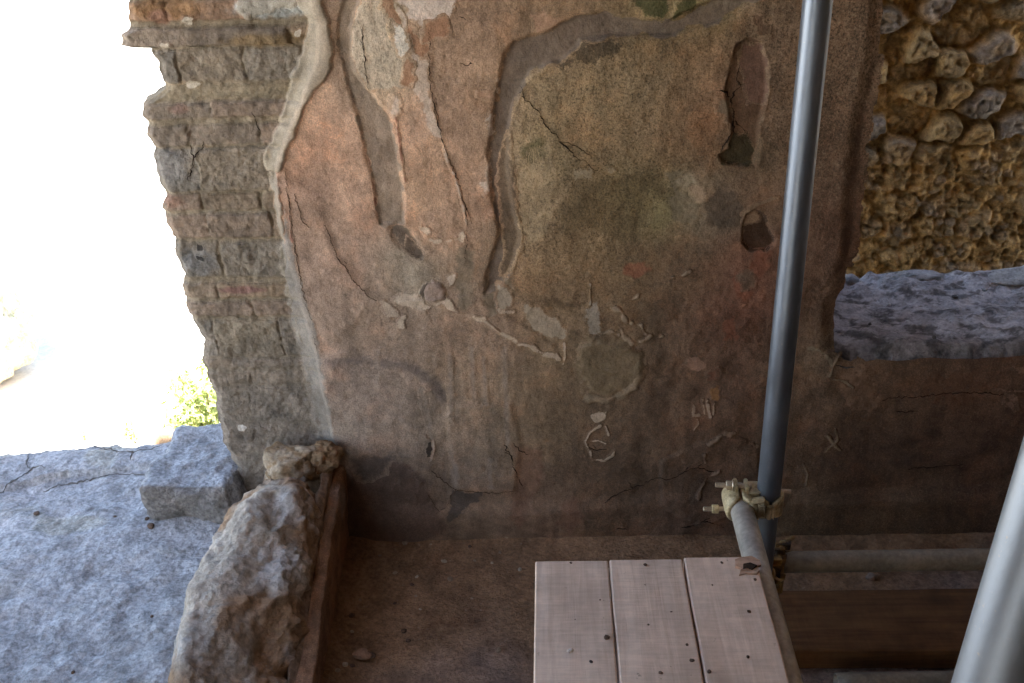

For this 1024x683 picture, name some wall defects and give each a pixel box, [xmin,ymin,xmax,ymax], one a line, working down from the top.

peeling [177,14,196,31]
peeling [234,0,297,23]
flaking render [333,0,468,263]
crack [428,32,471,264]
crack [519,89,598,171]
flaking render [474,0,771,294]
crack [285,172,377,348]
spalling [739,195,782,254]
peeling [379,272,567,366]
crack [0,444,163,493]
crack [428,442,527,512]
peeling [583,410,617,462]